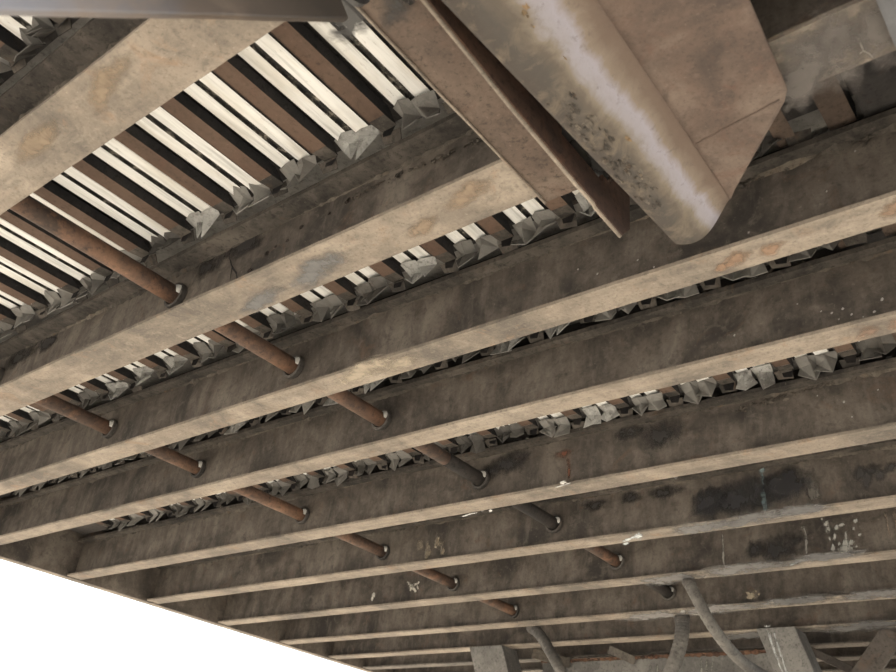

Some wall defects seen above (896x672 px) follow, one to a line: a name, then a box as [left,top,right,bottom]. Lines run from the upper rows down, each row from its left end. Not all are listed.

damp [641,466,862,585]